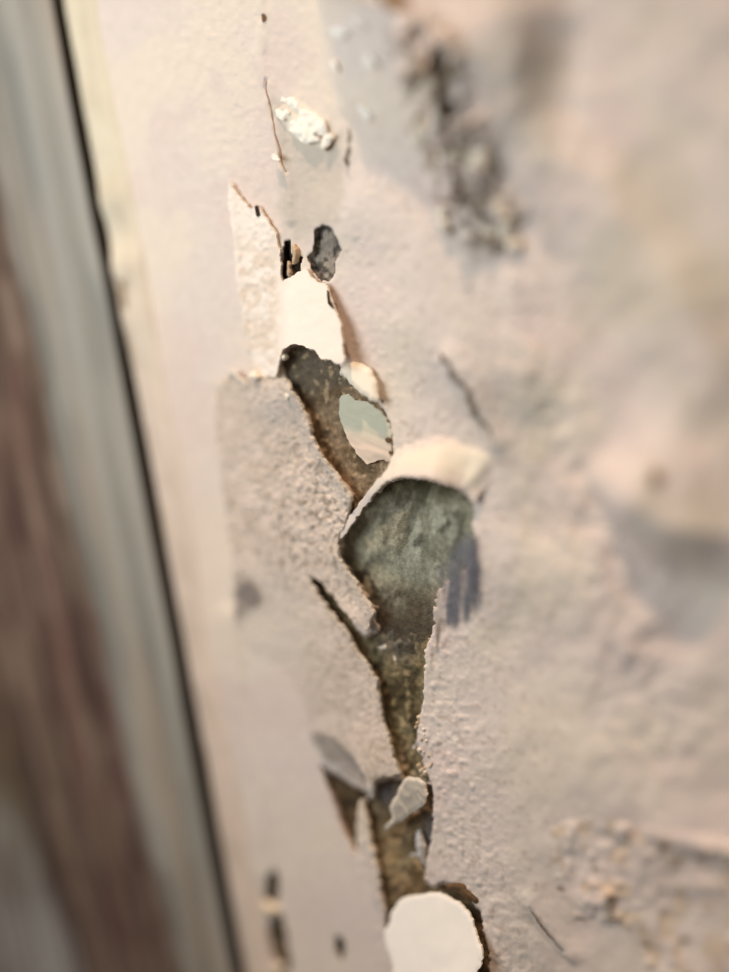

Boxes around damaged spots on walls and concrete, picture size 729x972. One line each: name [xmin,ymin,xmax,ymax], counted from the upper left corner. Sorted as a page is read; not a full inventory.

crack [265,80,286,172]
peeling [213,182,491,972]